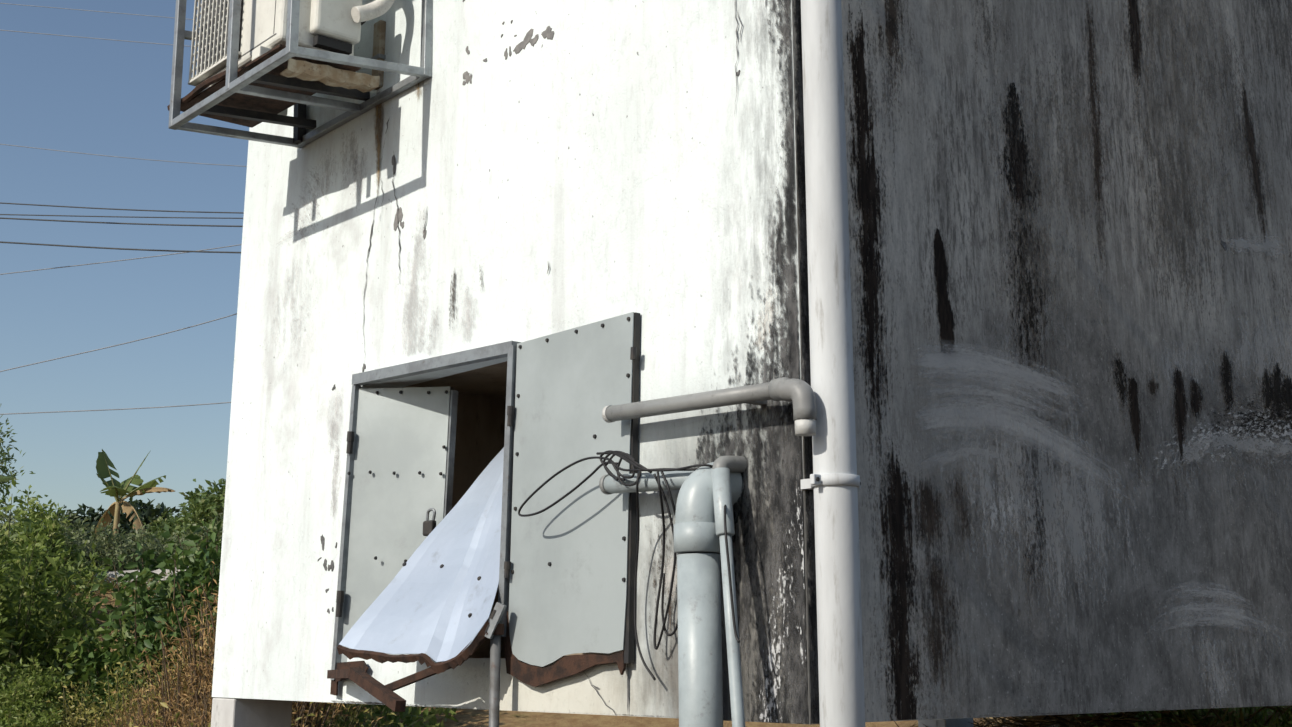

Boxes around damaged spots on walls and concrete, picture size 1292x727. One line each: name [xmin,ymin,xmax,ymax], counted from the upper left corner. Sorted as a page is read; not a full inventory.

peeling [501,20,554,60]
damp [878,0,903,86]
crack [363,119,427,358]
mould [728,0,811,386]
damp [1115,0,1292,299]
damp [914,0,1113,689]
damp [1113,352,1292,469]
rust [330,619,489,696]
rust [505,611,626,687]
mould [647,514,678,659]
mould [694,400,820,724]